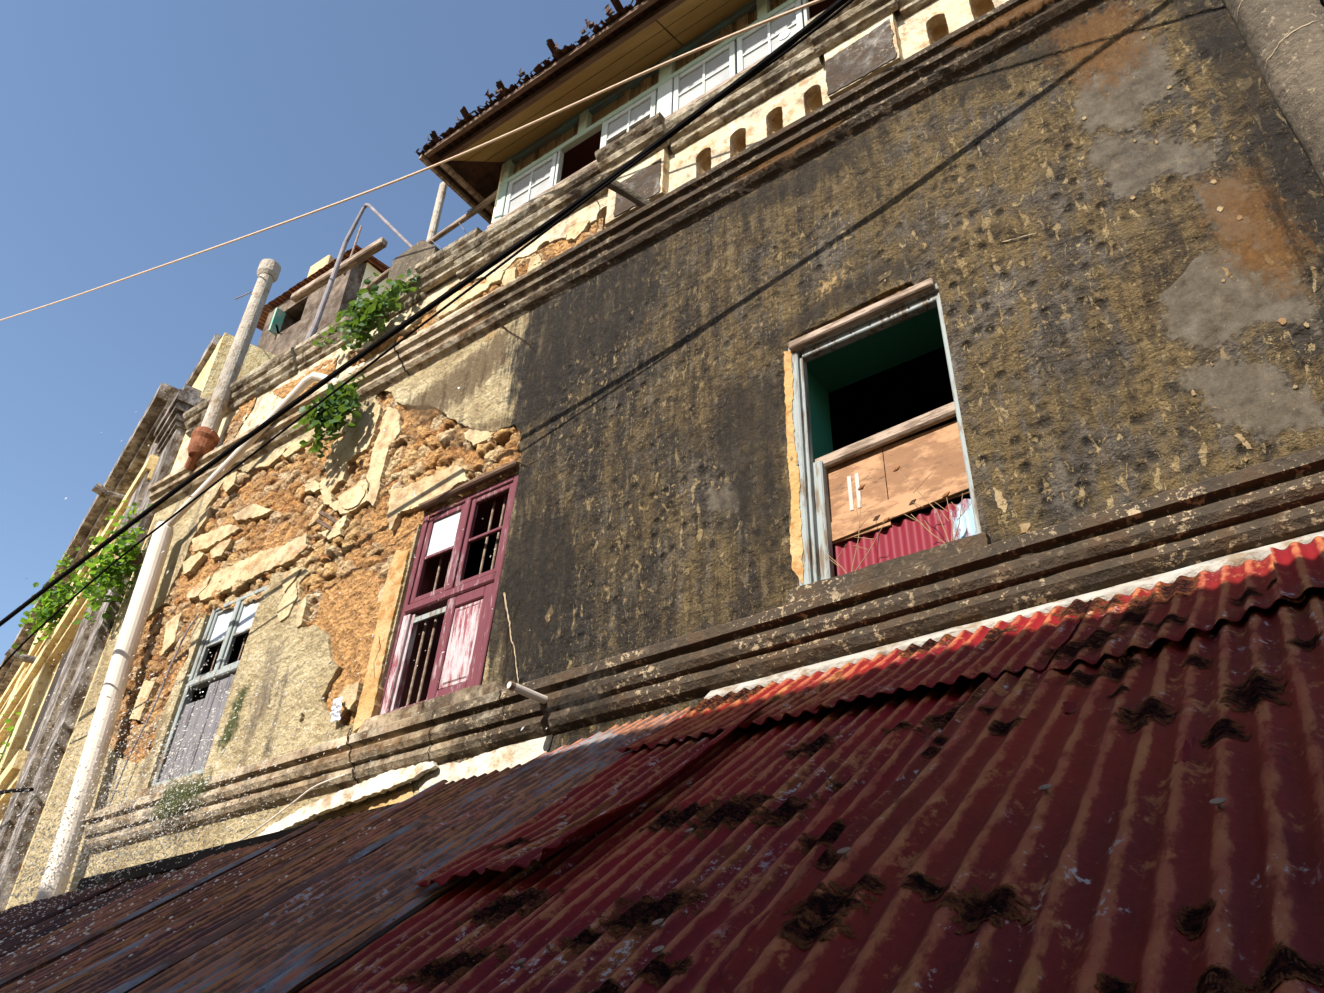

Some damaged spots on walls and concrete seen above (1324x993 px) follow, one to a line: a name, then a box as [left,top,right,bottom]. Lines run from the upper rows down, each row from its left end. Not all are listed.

spalling [110,392,521,764]
corrosion [896,634,954,658]
corrosion [1032,573,1201,733]
corrosion [686,685,772,714]
corrosion [780,732,849,759]
corrosion [881,686,1025,762]
corrosion [1194,667,1291,748]
corrosion [638,775,1033,950]
corrosion [389,887,566,993]
corrosion [545,885,709,956]
corrosion [582,952,694,993]
corrosion [1190,941,1324,993]